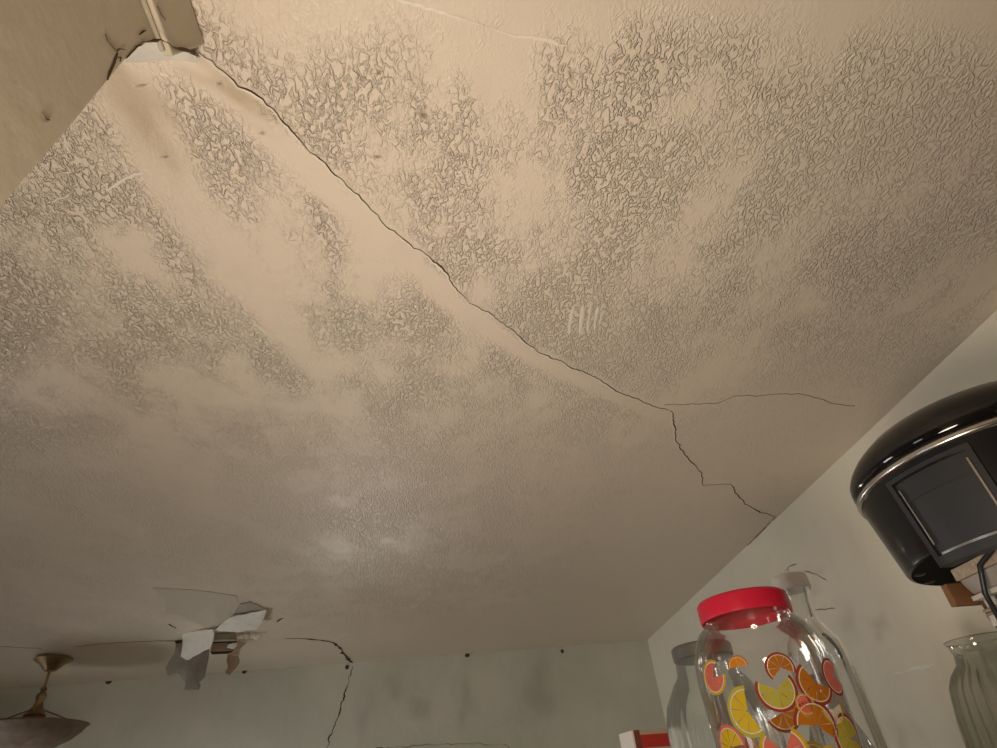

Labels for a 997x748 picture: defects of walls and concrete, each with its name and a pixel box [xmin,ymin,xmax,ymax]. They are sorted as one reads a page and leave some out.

crack [105,6,854,546]
flaking render [153,588,268,690]
crack [277,618,353,747]
crack [377,740,509,748]